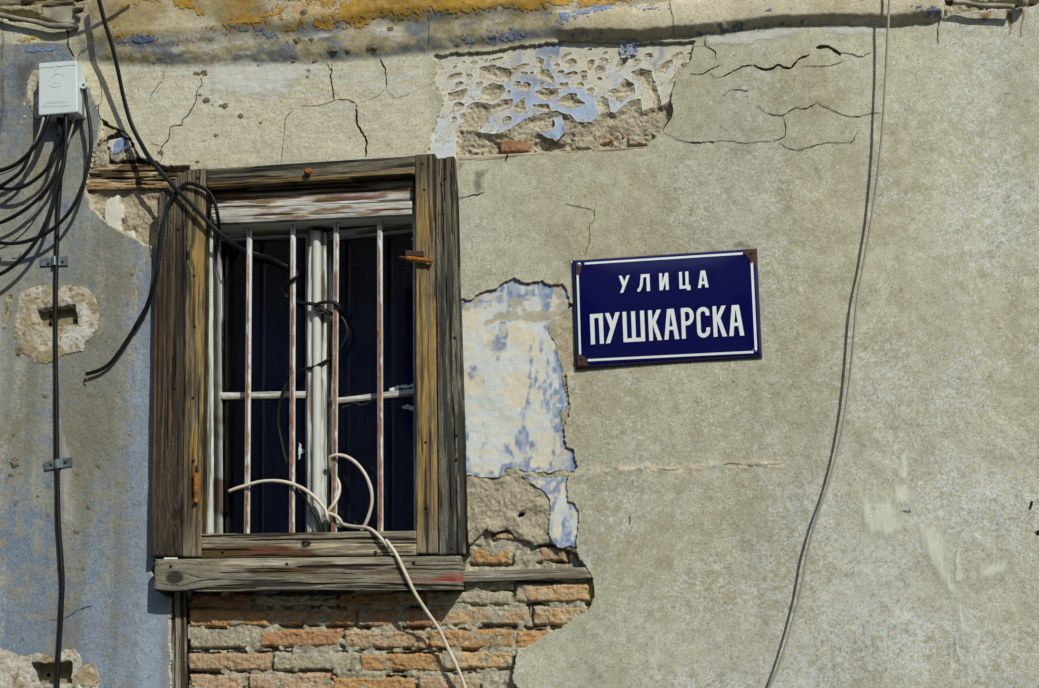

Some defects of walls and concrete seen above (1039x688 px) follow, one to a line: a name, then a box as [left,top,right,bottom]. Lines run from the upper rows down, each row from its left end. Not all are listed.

flaking render [912,0,1039,19]
flaking render [94,123,148,167]
crack [152,77,202,162]
crack [282,58,428,156]
flaking render [110,0,806,159]
crack [663,4,879,150]
flaking render [89,189,165,247]
flaking render [187,278,595,688]
peeling [78,663,100,688]